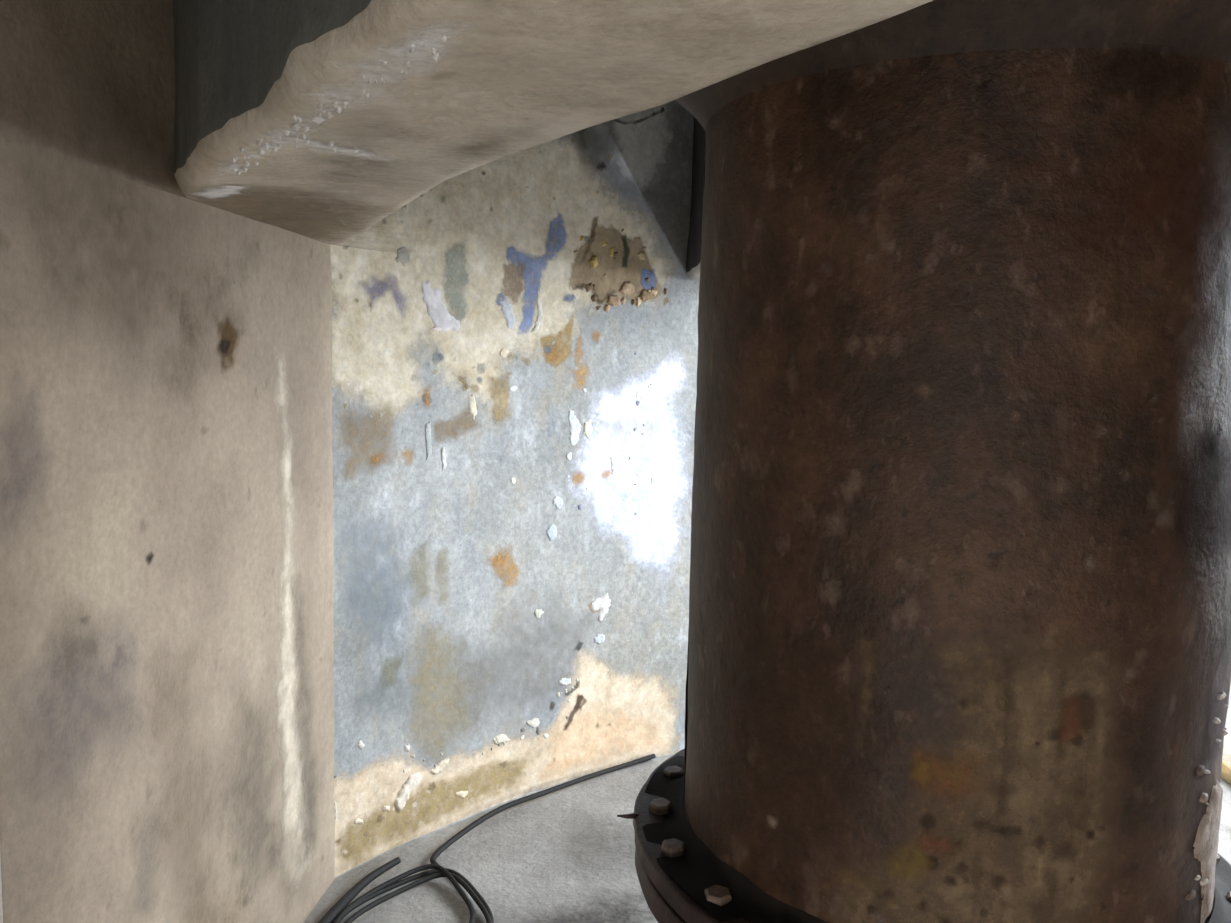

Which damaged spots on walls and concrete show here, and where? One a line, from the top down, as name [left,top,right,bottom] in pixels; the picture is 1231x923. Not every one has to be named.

peeling [330,136,670,472]
peeling [547,496,563,541]
flaking render [334,593,677,877]
peeling [1213,690,1231,743]
peeling [1185,759,1223,923]